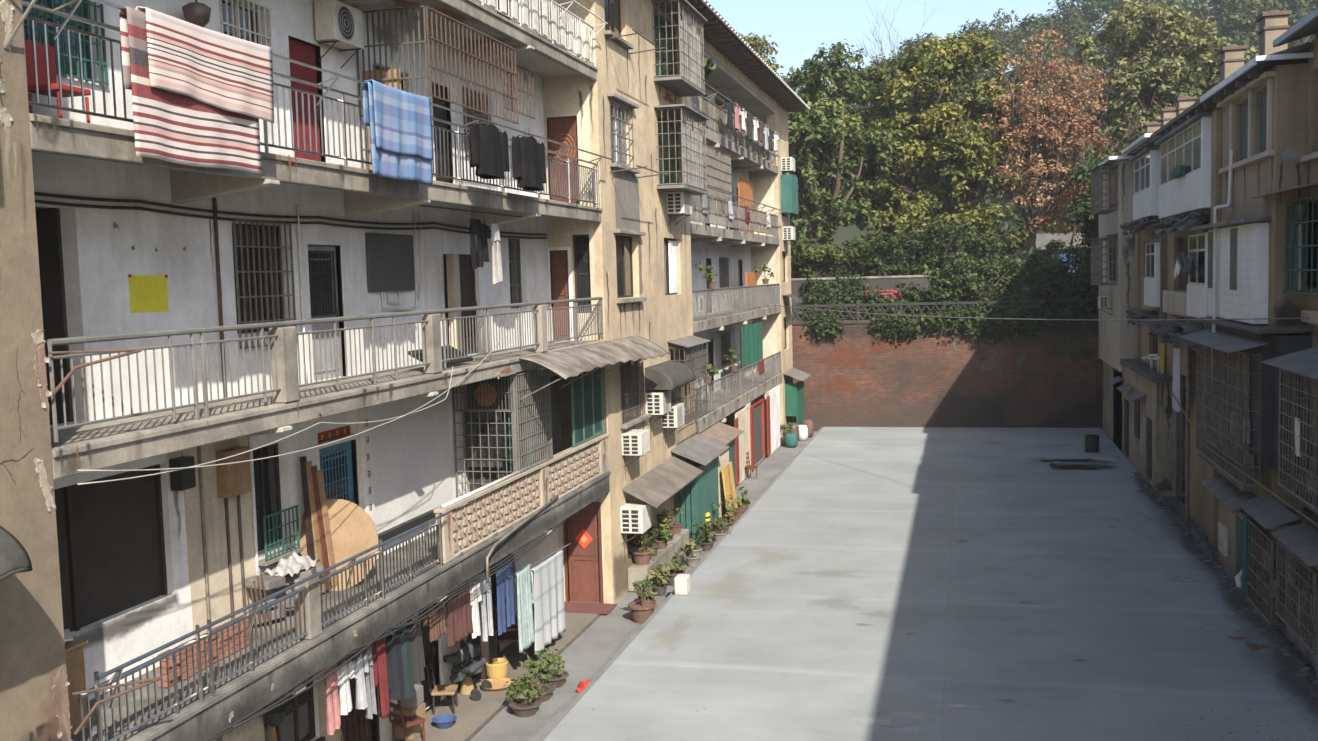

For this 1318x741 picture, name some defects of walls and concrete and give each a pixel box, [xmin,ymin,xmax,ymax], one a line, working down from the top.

flaking render [0,0,14,53]
flaking render [0,79,13,130]
crack [0,349,35,484]